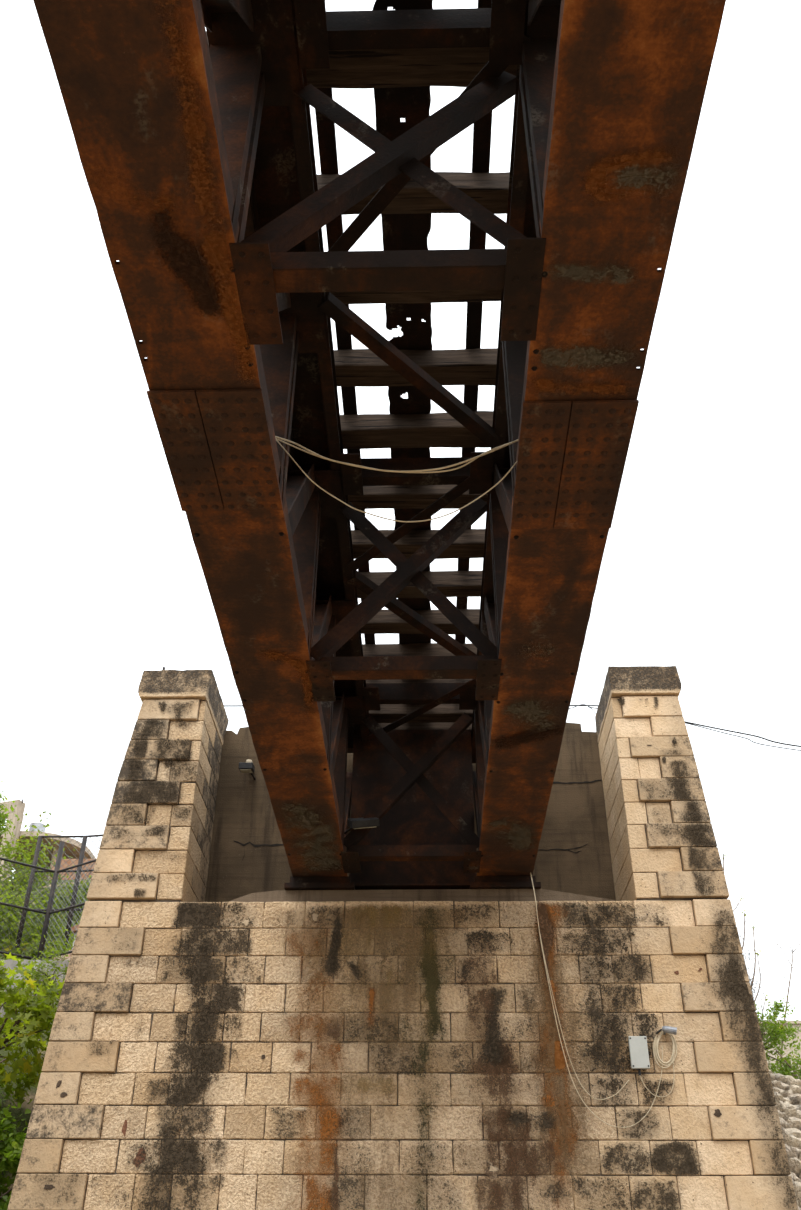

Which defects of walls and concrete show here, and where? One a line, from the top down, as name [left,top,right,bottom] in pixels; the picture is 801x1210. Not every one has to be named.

rust [153,210,224,316]
leakage [158,701,194,727]
leakage [126,902,264,1210]
rust [289,965,343,1210]
leakage [287,904,654,1210]
leakage [705,909,800,1210]